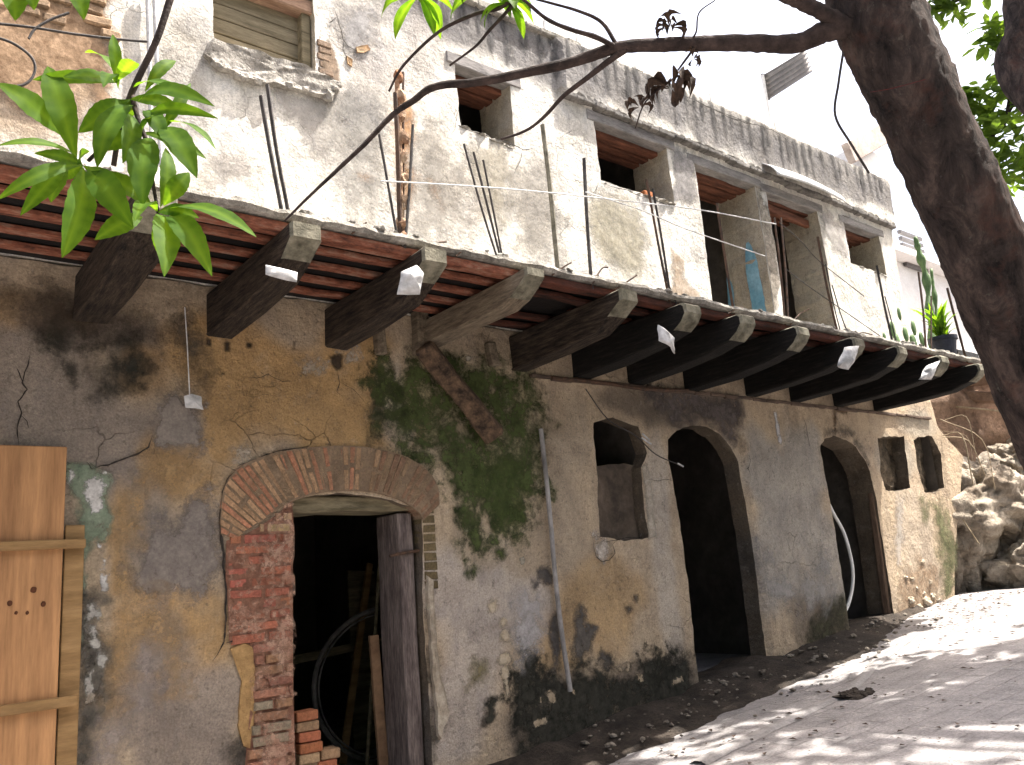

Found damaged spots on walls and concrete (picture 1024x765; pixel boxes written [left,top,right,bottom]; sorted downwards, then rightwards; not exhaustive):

spalling [203,5,390,170]
crack [16,356,30,442]
crack [88,438,152,469]
water stain [97,338,155,397]
water stain [359,353,423,463]
peeling [66,463,113,591]
water stain [462,517,509,579]
peeling [81,603,107,704]
water stain [466,567,695,756]